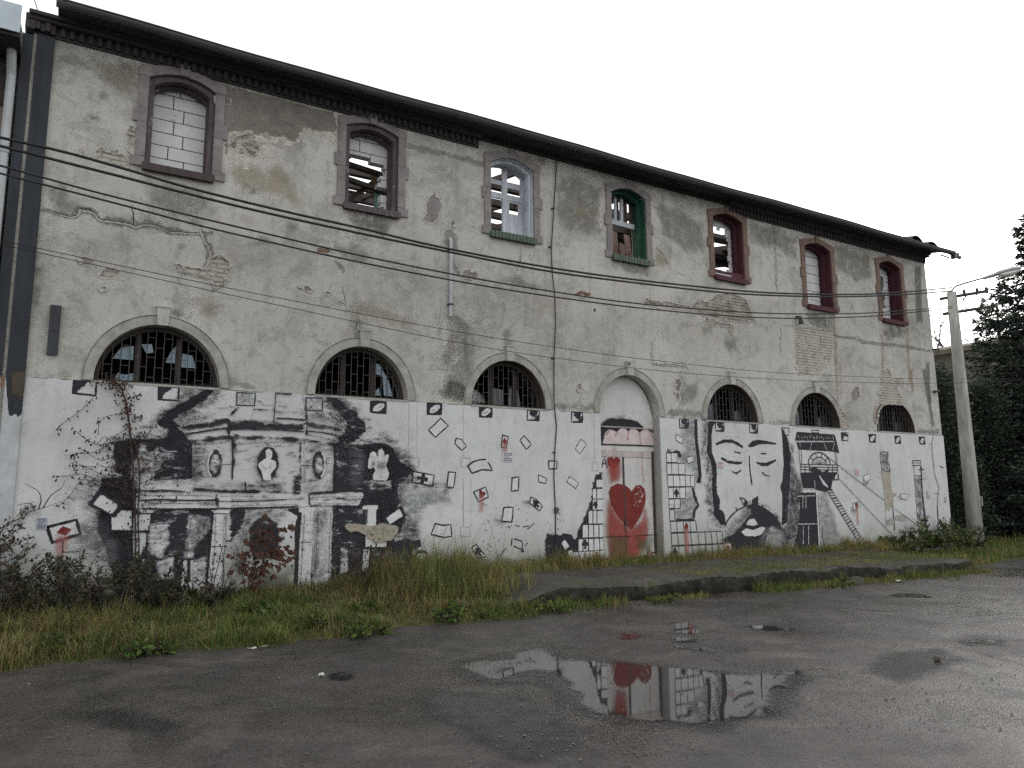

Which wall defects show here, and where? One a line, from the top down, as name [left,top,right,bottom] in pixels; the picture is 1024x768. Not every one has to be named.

spalling [75,123,136,166]
peeling [214,86,337,170]
crack [41,208,213,235]
spalling [422,190,457,228]
spalling [643,293,757,334]
spalling [794,326,833,376]